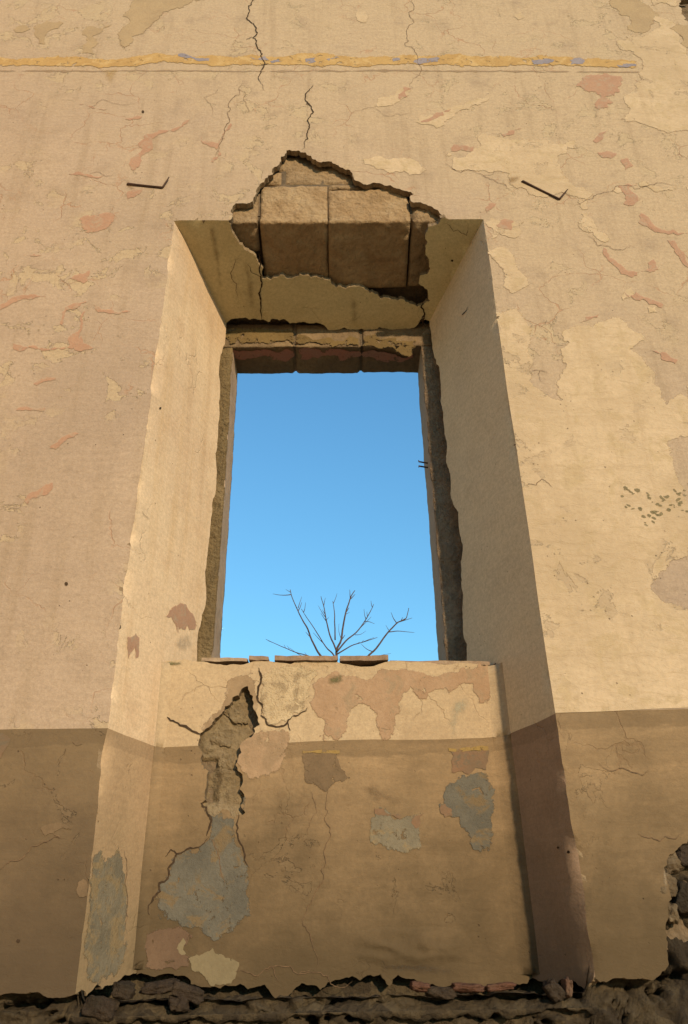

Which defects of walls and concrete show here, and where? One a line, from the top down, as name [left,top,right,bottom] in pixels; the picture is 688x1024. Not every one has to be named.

crack [207,0,268,156]
crack [304,87,314,147]
peeling [576,0,688,133]
spalling [232,155,439,288]
crack [167,717,202,735]
crack [256,669,307,731]
peeling [200,663,490,818]
peeling [145,926,239,986]